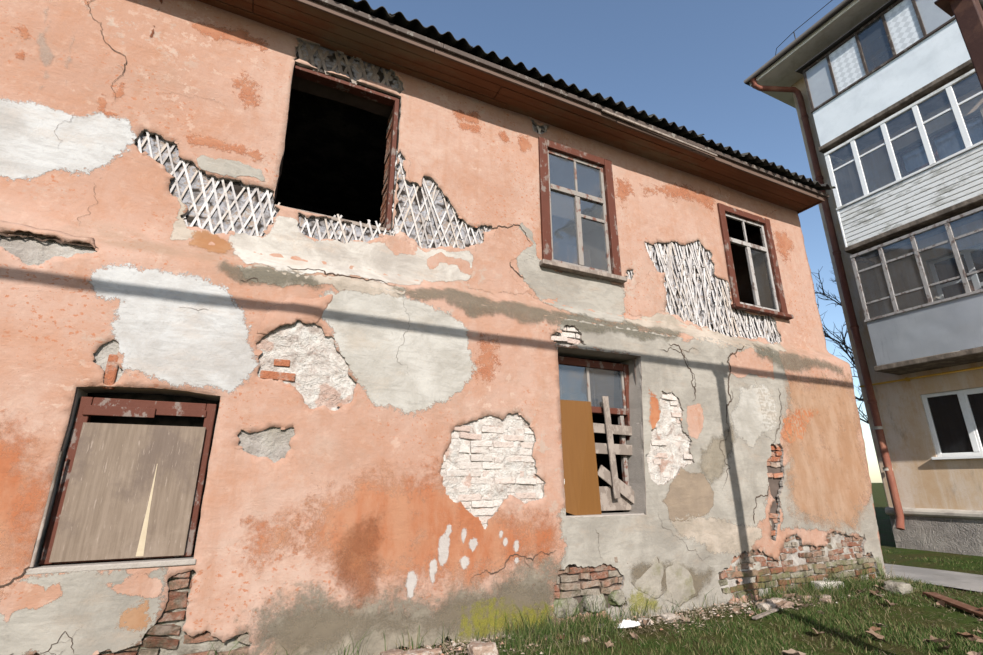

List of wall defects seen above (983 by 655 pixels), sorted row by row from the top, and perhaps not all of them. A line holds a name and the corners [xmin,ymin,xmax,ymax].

crack [87,0,127,95]
peeling [97,83,125,118]
flaking render [0,233,96,266]
peeling [135,131,558,305]
flaking render [93,340,123,390]
flaking render [235,427,295,463]
flaking render [254,321,357,411]
flaking render [440,413,547,529]
crack [660,344,696,401]
crack [720,346,744,488]
flaking render [622,239,890,599]